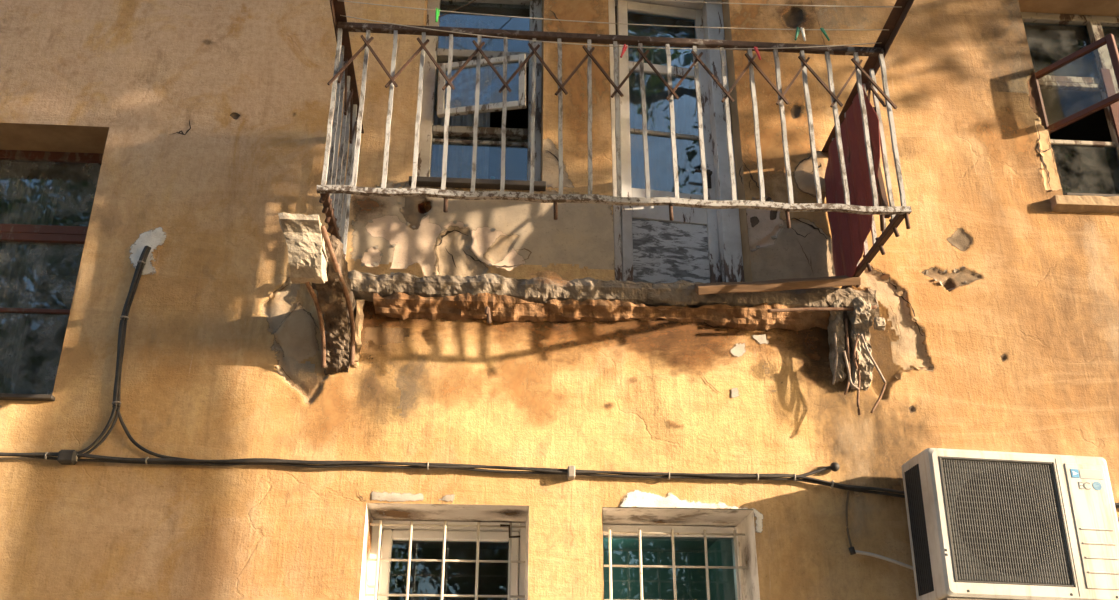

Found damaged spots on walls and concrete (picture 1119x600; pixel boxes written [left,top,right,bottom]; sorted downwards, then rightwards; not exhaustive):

water stain [730,0,811,177]
spalling [1028,72,1062,191]
peeling [351,138,615,277]
spalling [261,278,328,404]
corrosion [355,299,442,343]
water stain [314,327,553,439]
corrosion [473,318,742,370]
corrosion [757,327,829,382]
water stain [805,328,860,454]
spalling [767,266,935,415]
spalling [922,266,981,291]
water stain [868,417,922,493]